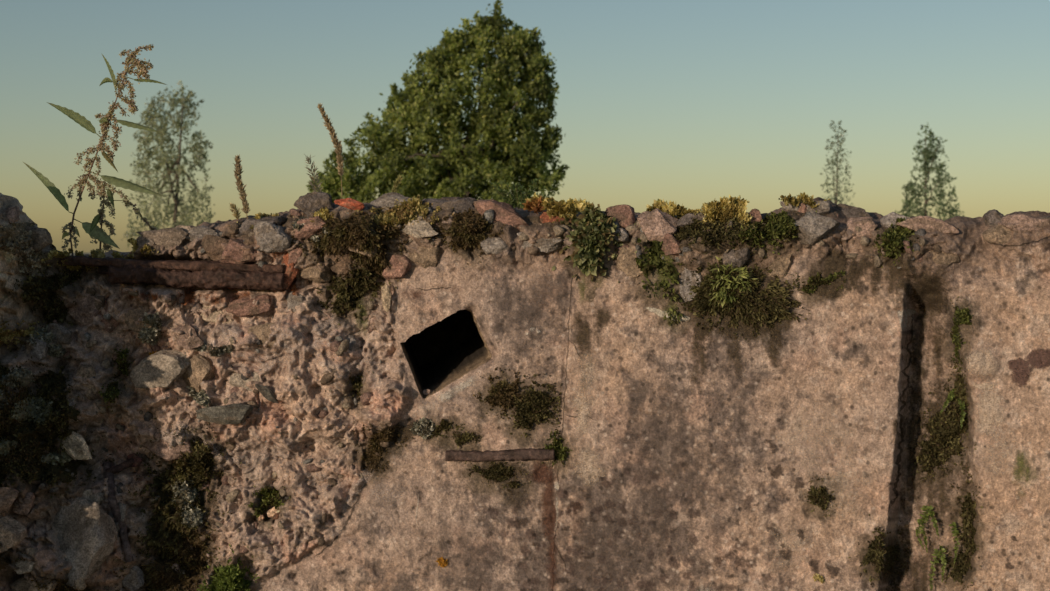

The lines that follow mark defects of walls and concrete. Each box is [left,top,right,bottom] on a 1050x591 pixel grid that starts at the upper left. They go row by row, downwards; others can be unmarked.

crack [561,271,593,438]
leakage [687,301,792,381]
leakage [810,248,967,530]
crack [313,470,374,558]
rust [533,462,557,588]
leakage [542,490,666,566]
leakage [767,527,790,560]
leakage [809,560,839,578]
leakage [873,532,941,591]